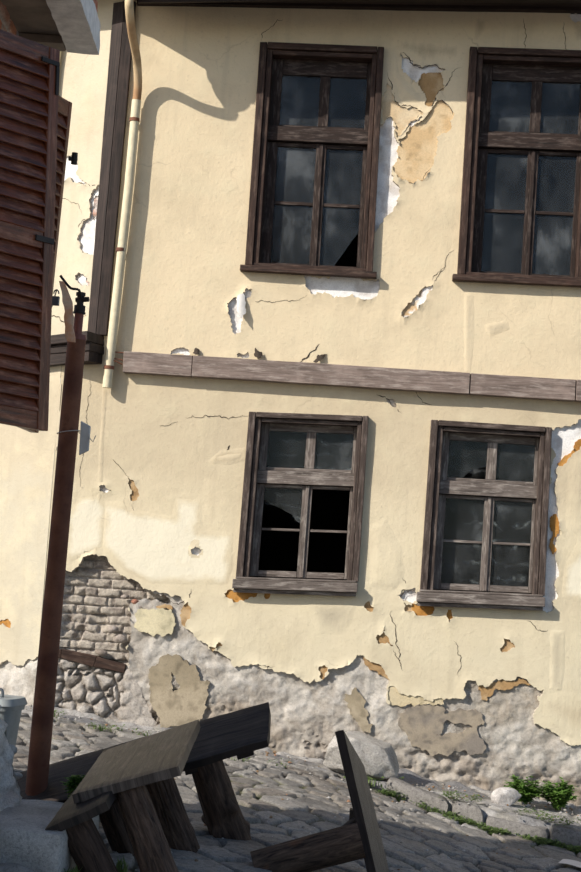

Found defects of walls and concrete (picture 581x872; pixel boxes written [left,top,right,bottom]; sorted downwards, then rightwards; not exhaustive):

flaking render [64,156,86,184]
peeling [369,54,454,232]
flaking render [79,187,99,255]
flaking render [228,289,252,334]
flaking render [304,275,380,300]
peeling [401,285,433,318]
flaking render [543,419,581,613]
crack [390,580,412,669]
spalling [0,658,38,706]
spalling [54,555,581,806]